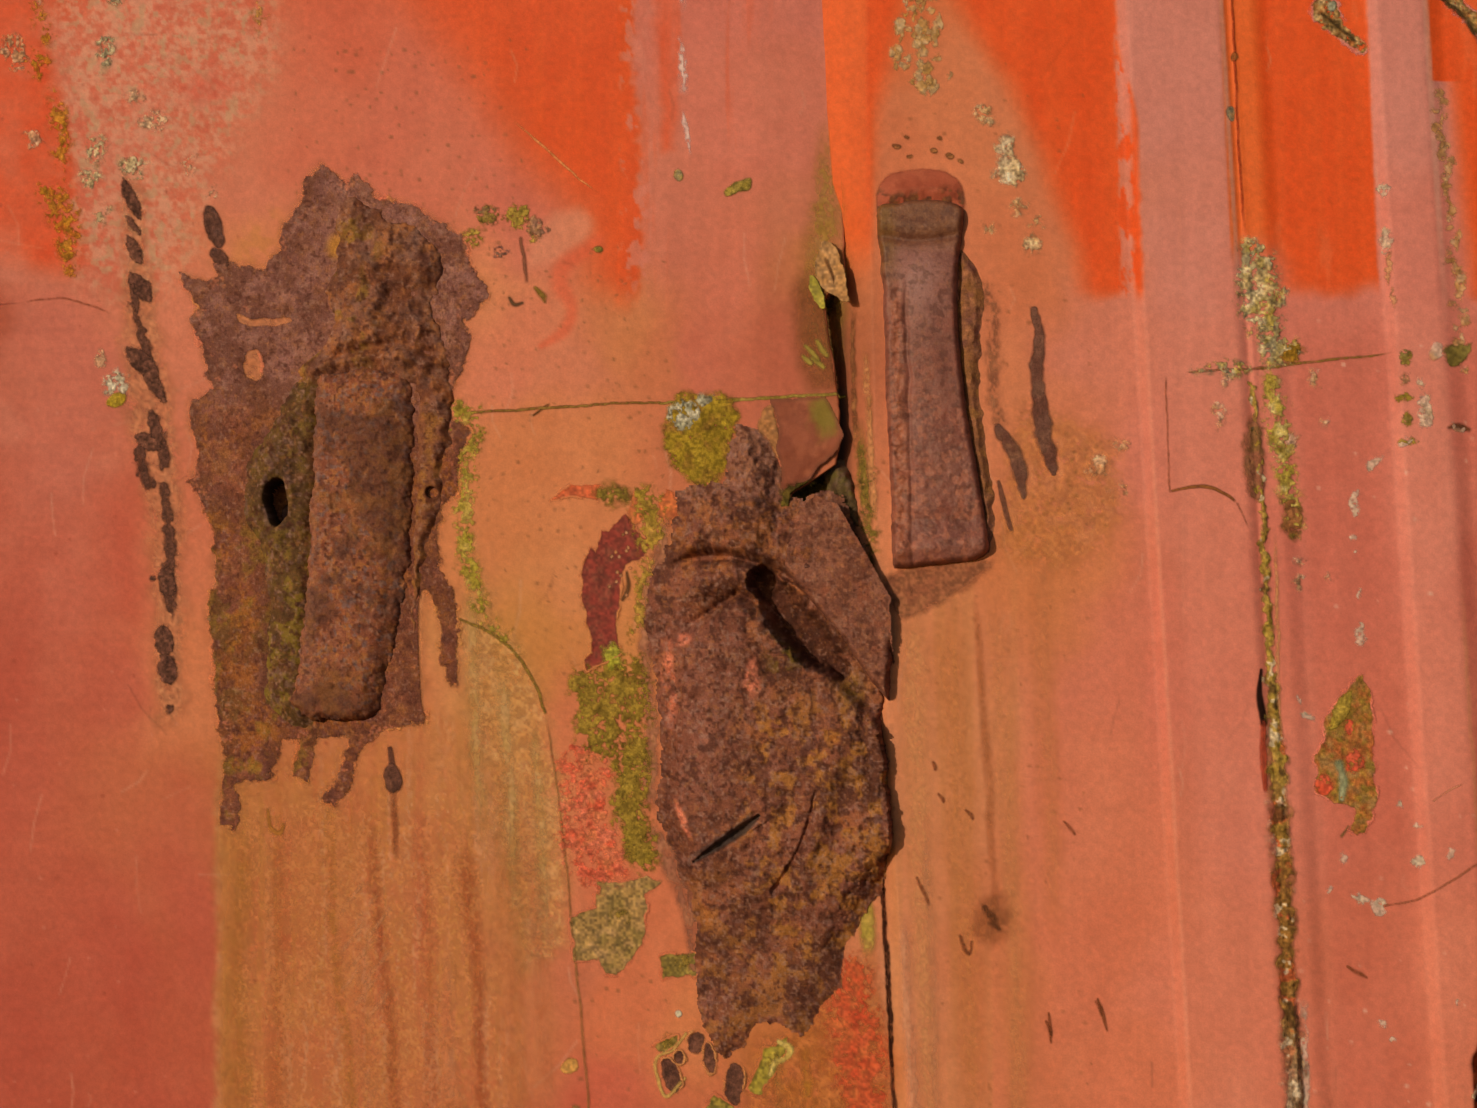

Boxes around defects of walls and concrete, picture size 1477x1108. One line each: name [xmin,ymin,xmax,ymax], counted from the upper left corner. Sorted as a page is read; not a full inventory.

corrosion [984,289,1028,530]
corrosion [1029,306,1058,476]
corrosion [179,164,489,844]
peeling [552,484,600,500]
peeling [1349,490,1359,516]
peeling [580,490,677,672]
corrosion [883,561,991,617]
peeling [1297,675,1379,837]
peeling [568,876,661,977]
corrosion [650,828,696,972]
peeling [659,951,698,981]
peeling [1352,893,1386,916]